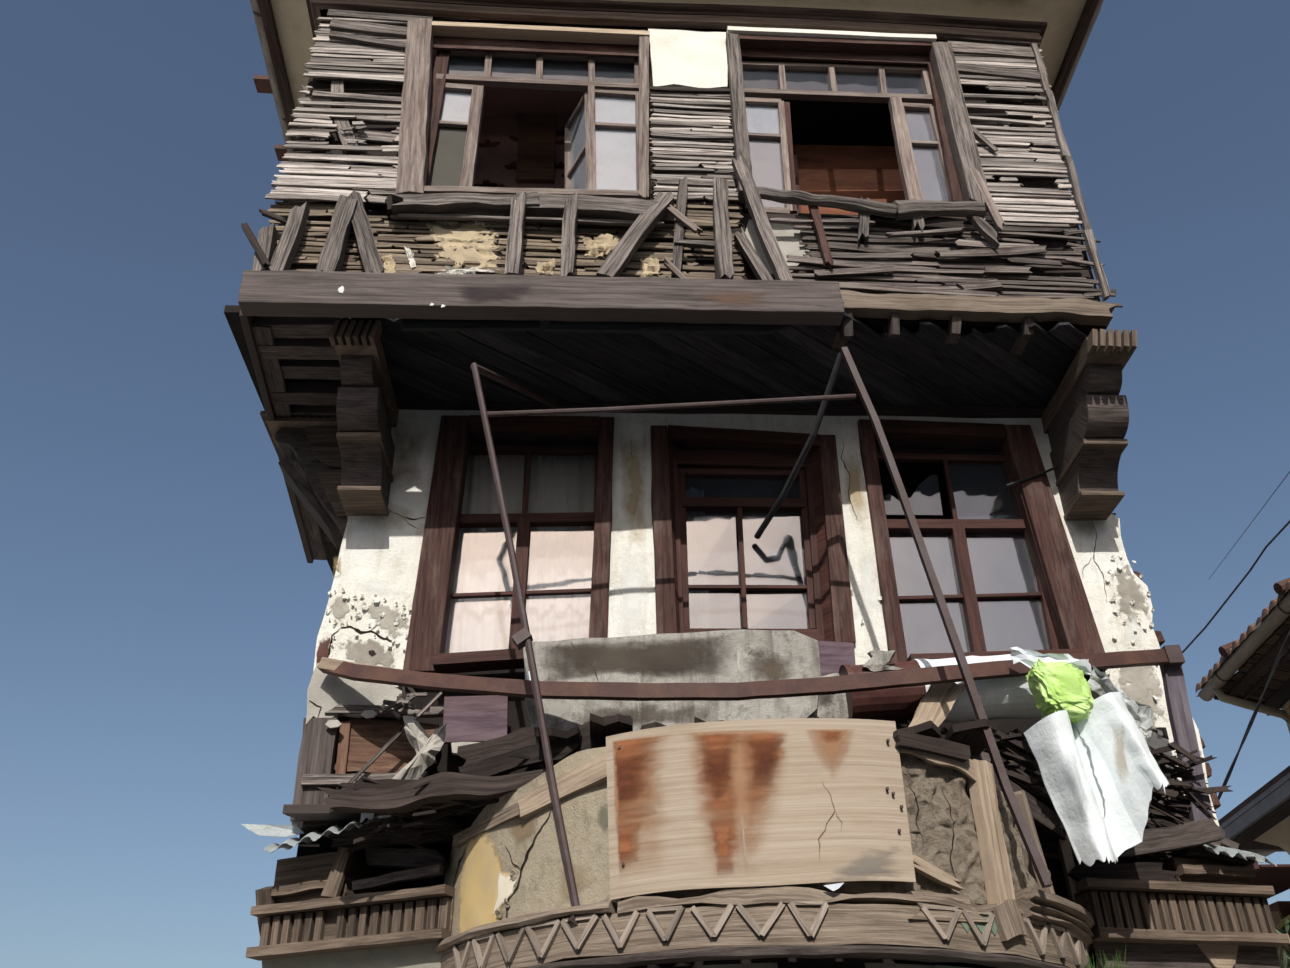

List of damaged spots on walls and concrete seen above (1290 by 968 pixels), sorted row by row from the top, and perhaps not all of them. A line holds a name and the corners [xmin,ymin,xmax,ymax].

crack [1082,521,1107,602]
crack [327,624,395,658]
peeling [316,588,412,668]
damp [553,639,720,683]
damp [737,649,787,680]
peeling [1105,555,1165,650]
damp [546,699,570,719]
rust [815,730,846,763]
rust [614,738,654,860]
rust [700,731,780,866]
crack [818,784,842,860]
peeling [459,834,517,933]